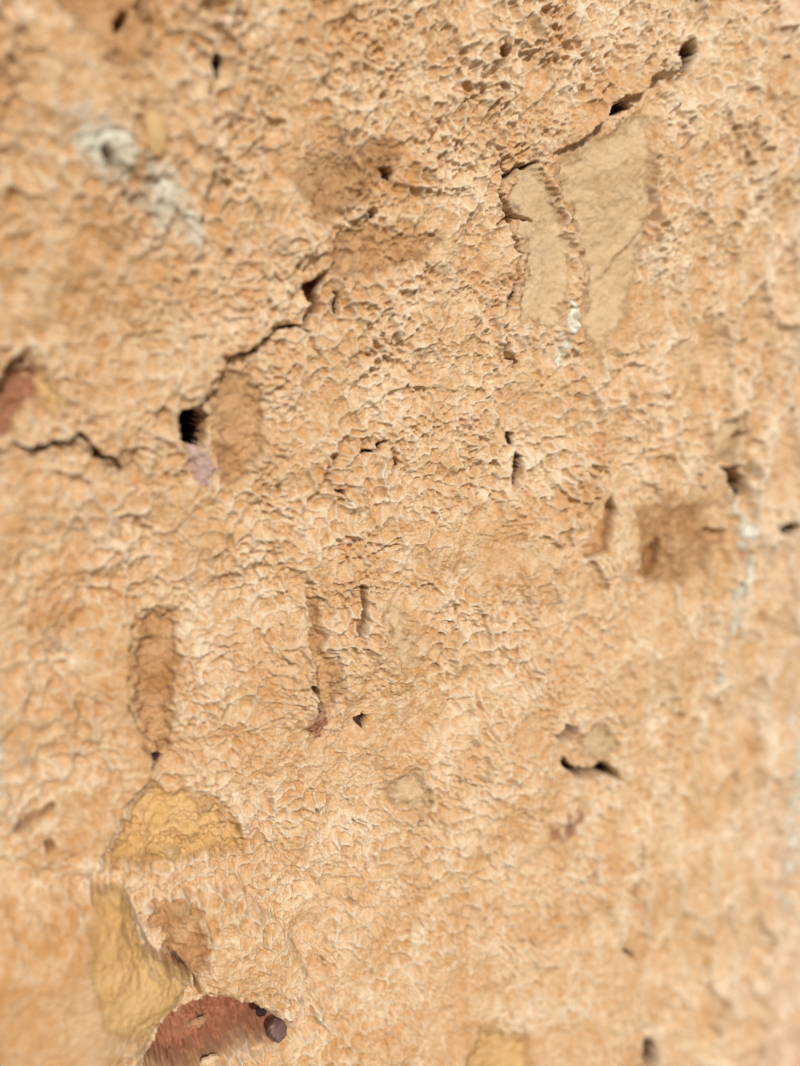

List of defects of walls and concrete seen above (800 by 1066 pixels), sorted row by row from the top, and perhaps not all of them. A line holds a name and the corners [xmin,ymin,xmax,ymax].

crack [13,431,120,470]
spalling [146,995,270,1066]